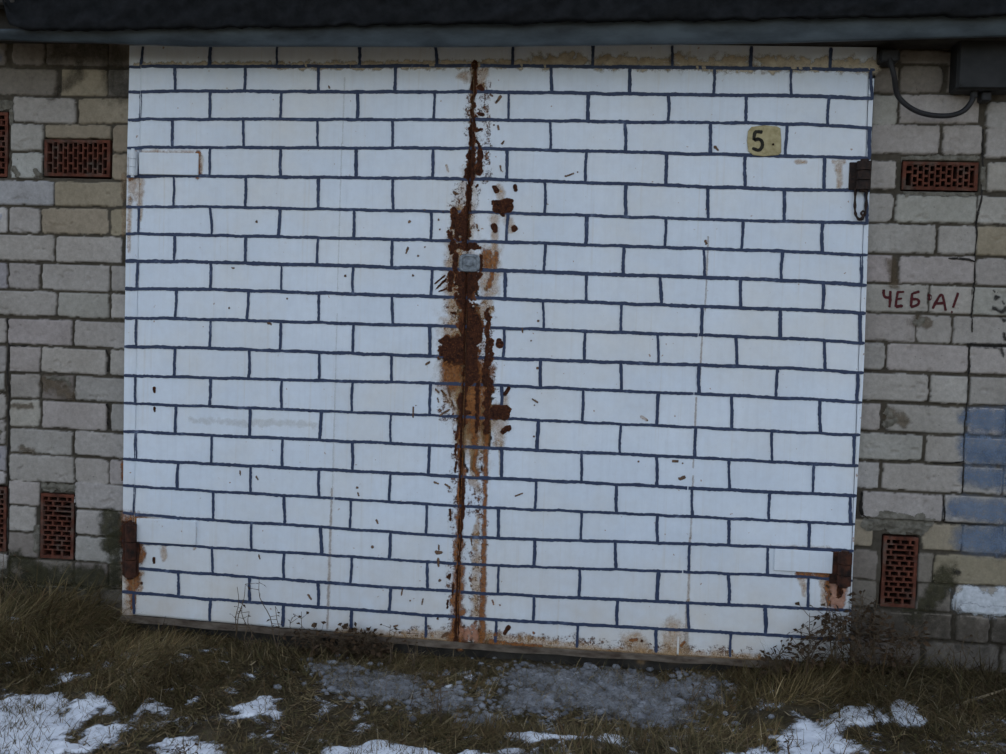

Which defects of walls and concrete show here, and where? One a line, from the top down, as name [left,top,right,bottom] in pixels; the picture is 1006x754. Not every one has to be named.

corrosion [361,60,761,660]
corrosion [119,510,164,615]
corrosion [795,572,847,608]